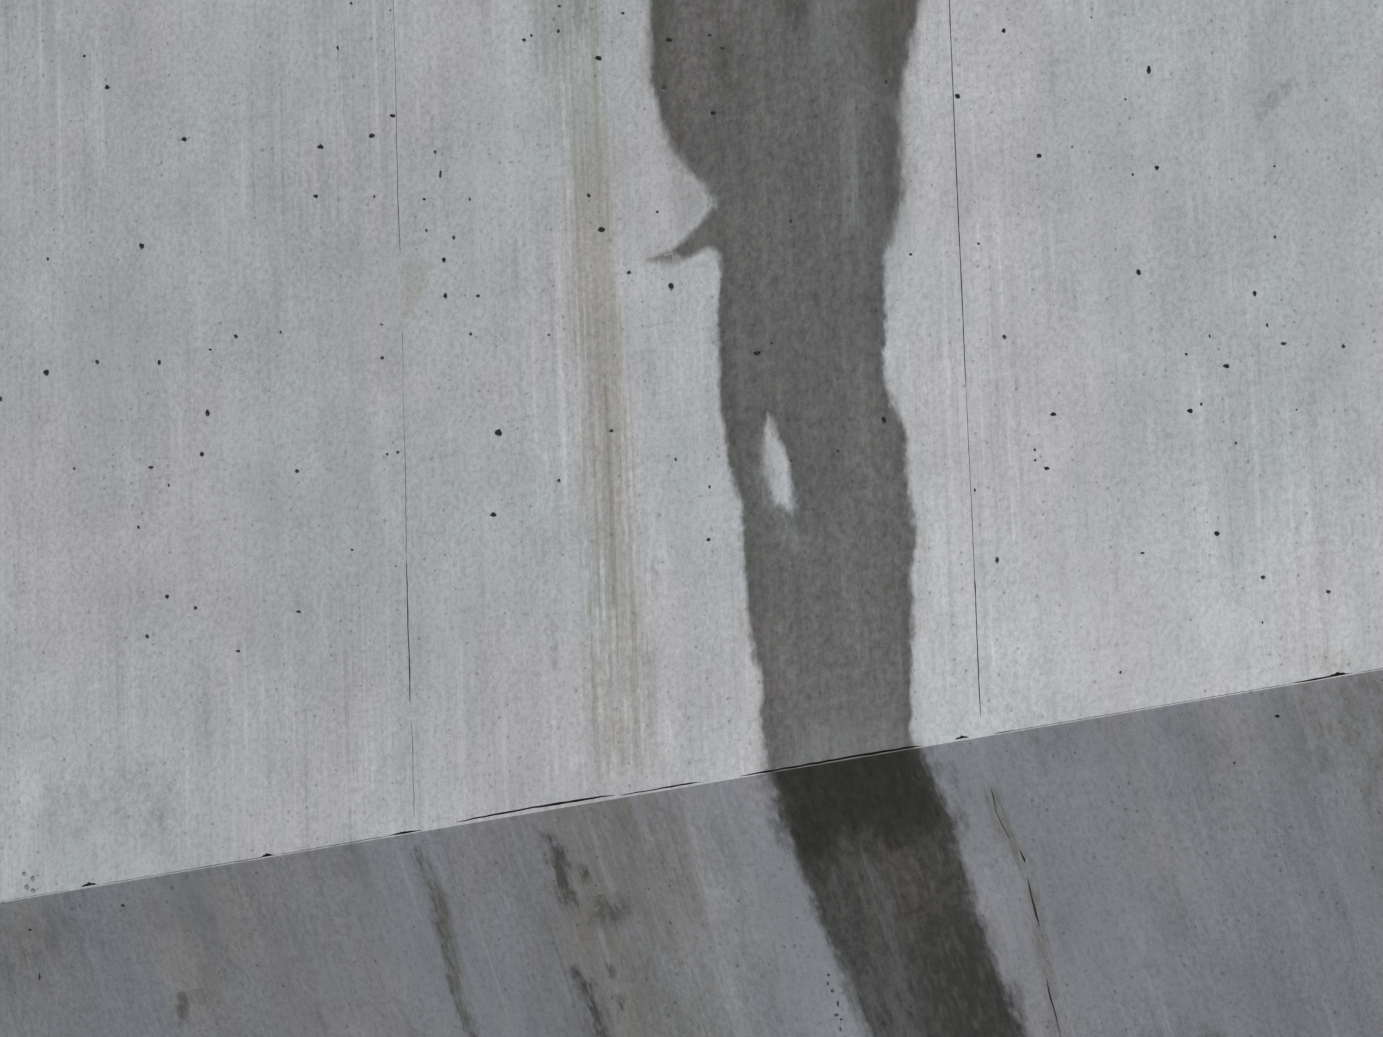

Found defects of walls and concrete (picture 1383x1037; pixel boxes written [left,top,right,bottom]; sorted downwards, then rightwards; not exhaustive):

leakage [396,0,1041,1037]